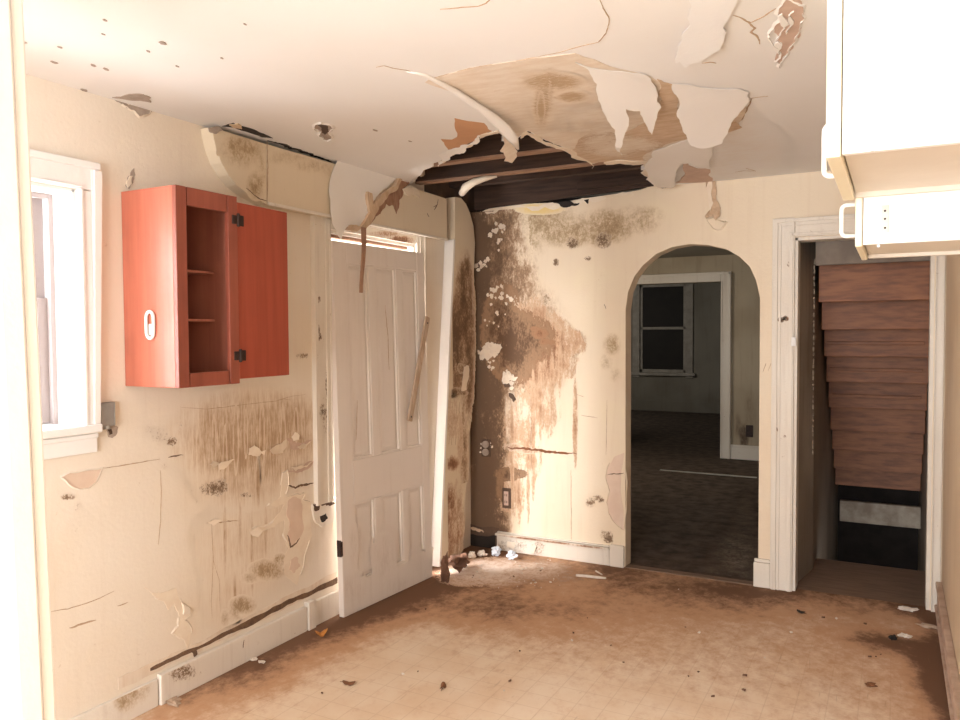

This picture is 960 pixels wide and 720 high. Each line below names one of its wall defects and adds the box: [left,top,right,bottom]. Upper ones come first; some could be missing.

crack [733,8,776,44]
peeling [767,0,807,69]
water stain [216,133,334,202]
peeling [208,122,634,293]
peeling [407,53,749,231]
water stain [506,64,663,158]
water stain [452,203,668,555]
crack [502,443,576,454]
crack [107,454,181,543]
water stain [144,367,327,631]
crack [51,591,128,628]
flaking render [118,461,338,690]